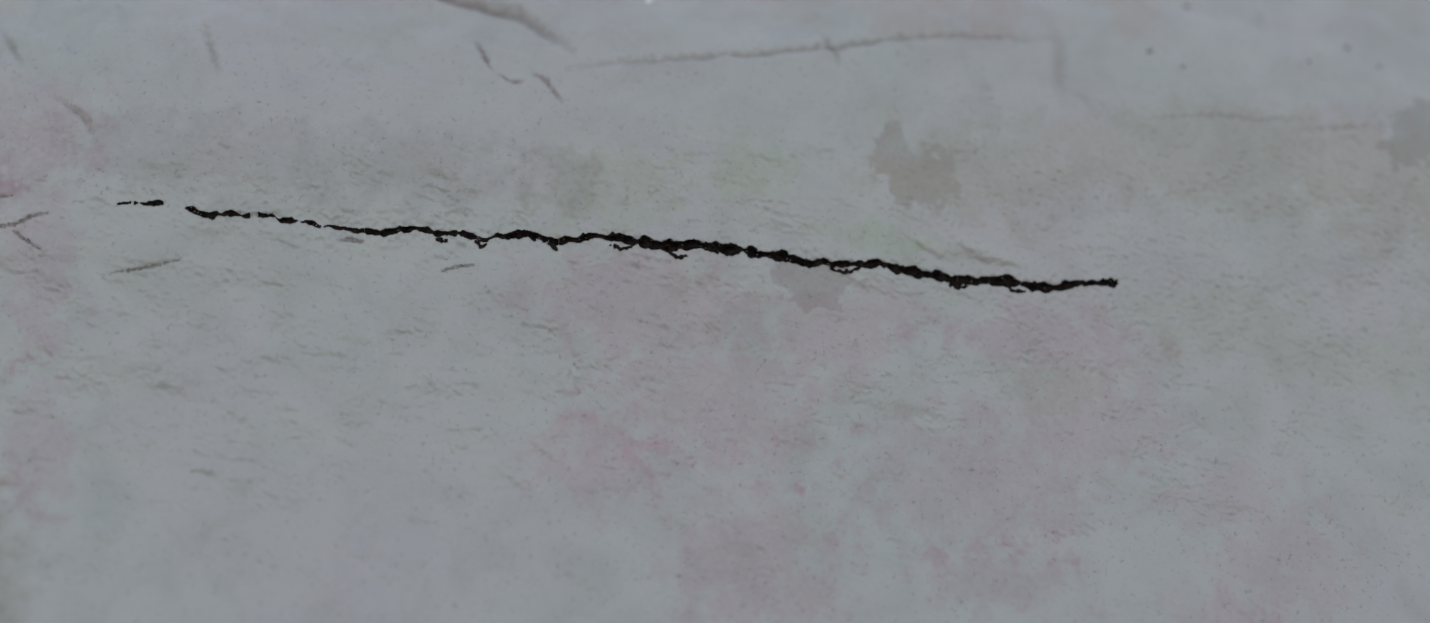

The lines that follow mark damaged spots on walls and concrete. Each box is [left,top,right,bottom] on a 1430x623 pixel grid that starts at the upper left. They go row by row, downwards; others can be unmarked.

crack [111,199,1118,293]